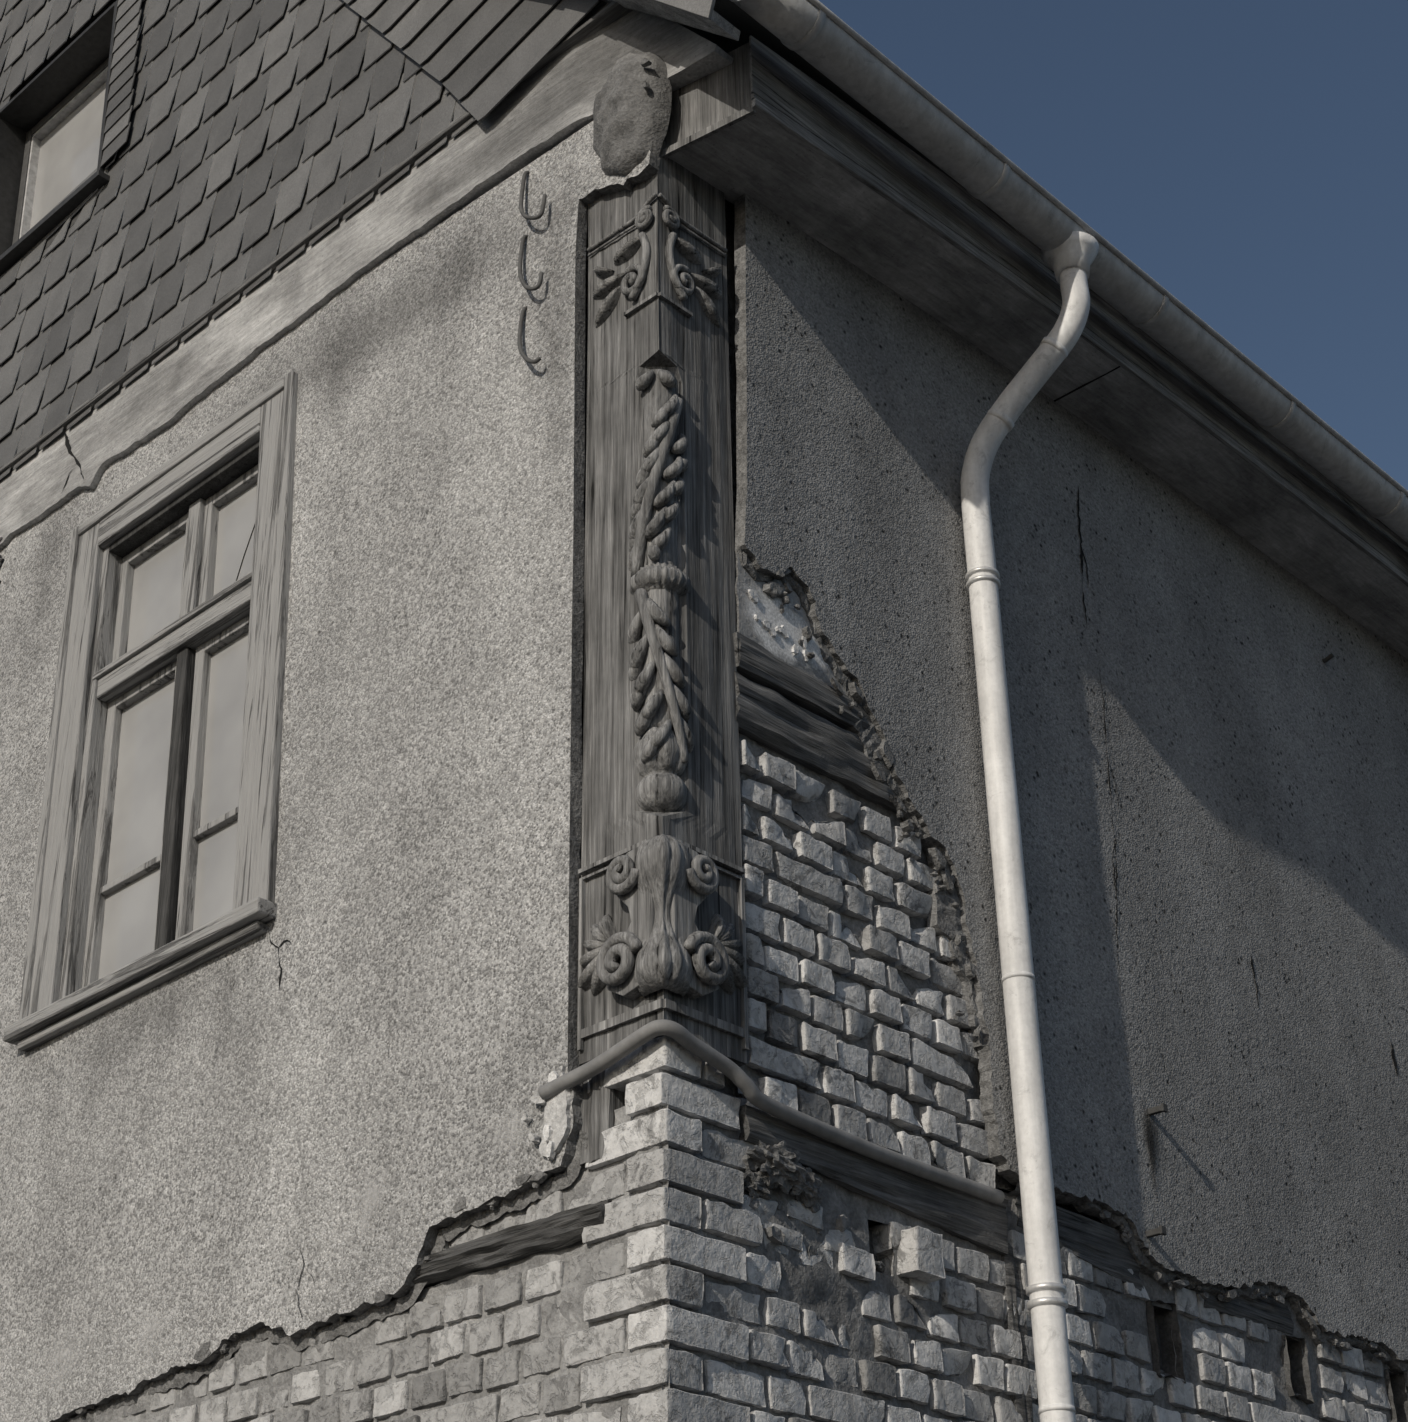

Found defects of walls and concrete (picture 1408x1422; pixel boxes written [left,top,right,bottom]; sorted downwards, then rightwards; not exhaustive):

crack [62,433,83,491]
crack [1077,486,1089,623]
spalling [734,547,984,1048]
crack [268,931,292,987]
spalling [65,1066,588,1422]
spalling [739,1140,885,1273]
spalling [1055,1194,1408,1422]